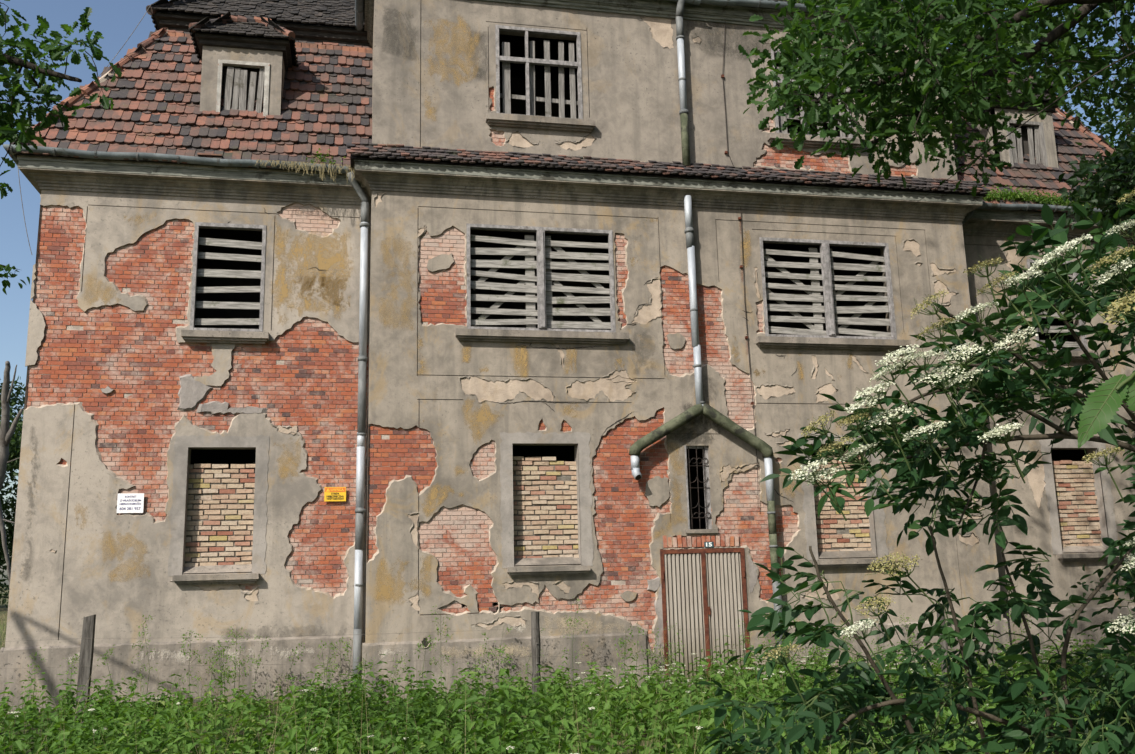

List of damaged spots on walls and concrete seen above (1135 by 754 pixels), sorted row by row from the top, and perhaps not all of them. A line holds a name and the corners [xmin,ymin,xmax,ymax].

flaking render [489,129,538,149]
flaking render [555,134,597,151]
flaking render [753,117,852,174]
flaking render [373,191,388,208]
damp [275,227,346,311]
flaking render [417,226,467,330]
flaking render [24,195,438,601]
flaking render [458,370,637,404]
flaking render [614,233,795,464]
flaking render [408,407,801,653]